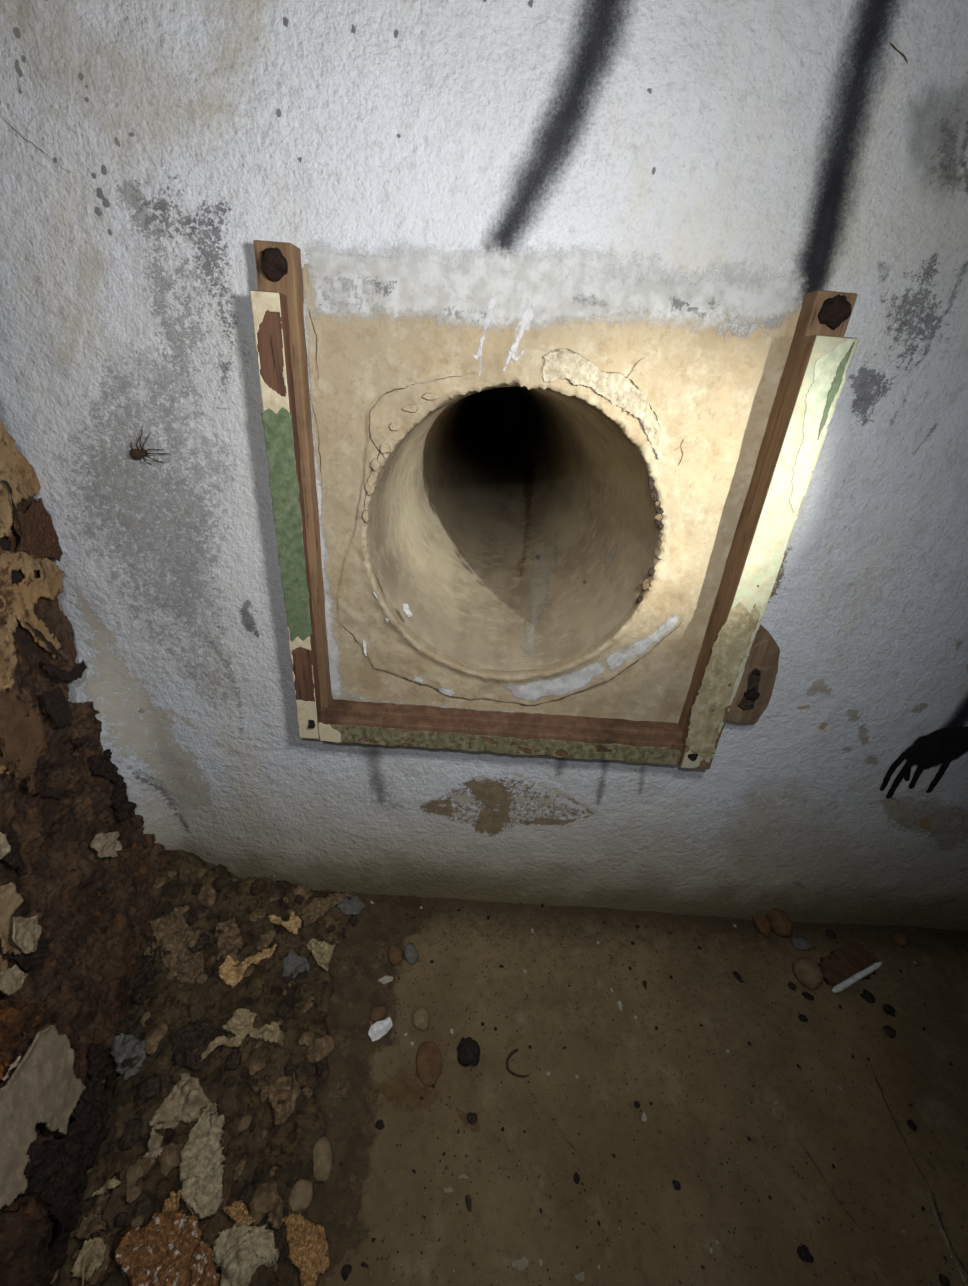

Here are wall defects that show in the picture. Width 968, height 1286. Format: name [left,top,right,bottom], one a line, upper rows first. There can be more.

peeling [92,165,112,235]
leakage [847,237,968,426]
leakage [60,175,250,737]
peeling [0,419,137,858]
leakage [240,600,257,637]
spalling [420,773,596,836]
peeling [0,826,53,996]
peeling [0,1025,86,1209]
crack [869,1061,968,1286]